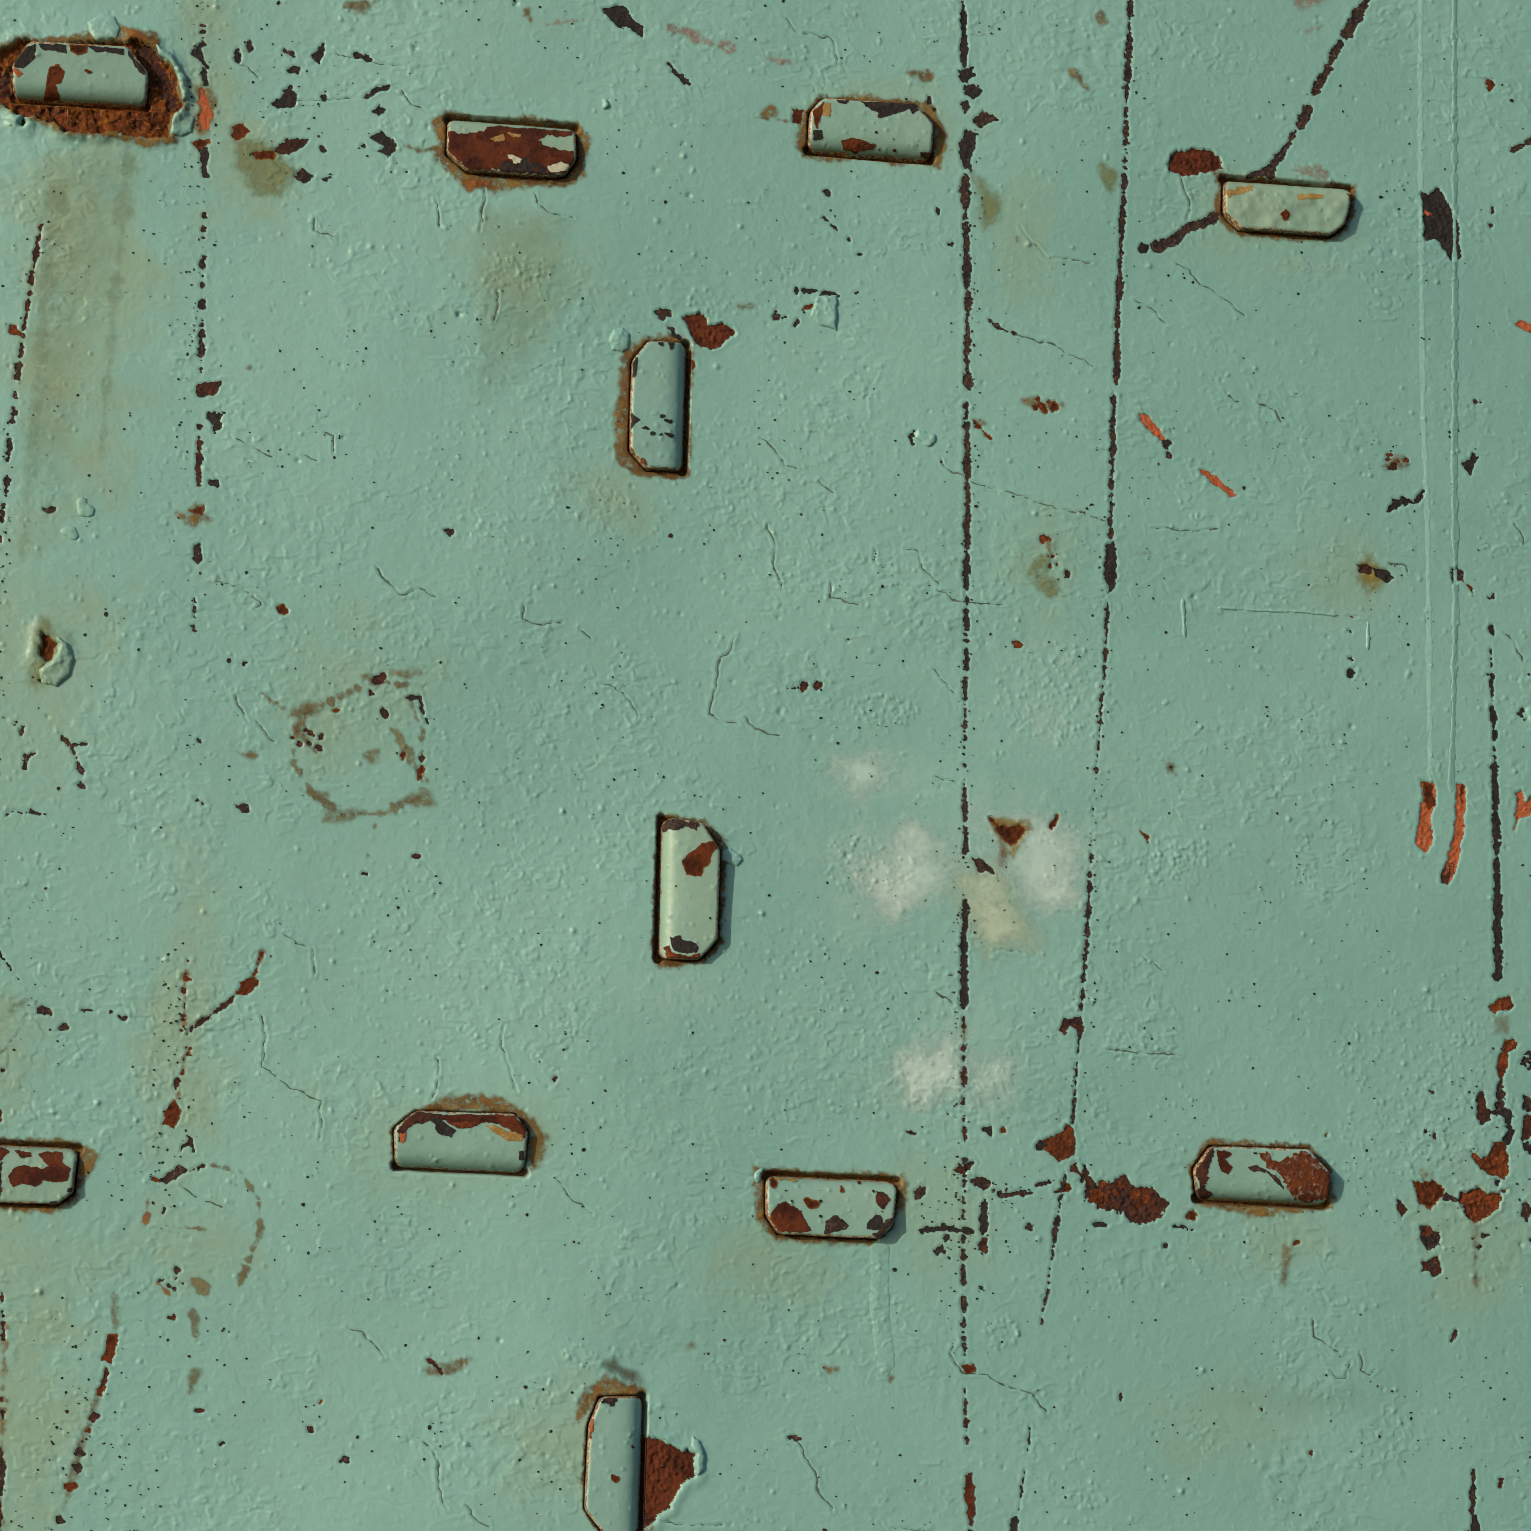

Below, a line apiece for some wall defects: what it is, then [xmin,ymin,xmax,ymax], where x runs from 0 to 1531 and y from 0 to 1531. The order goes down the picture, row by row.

corrosion [0,27,217,147]
corrosion [980,181,999,225]
corrosion [1100,163,1116,191]
corrosion [1169,148,1355,242]
peeling [1379,139,1507,264]
peeling [162,552,341,615]
peeling [186,735,250,813]
peeling [883,119,1177,1377]
corrosion [1416,781,1436,852]
corrosion [1441,783,1466,884]
peeling [1325,1031,1531,1279]
peeling [2,1296,162,1531]